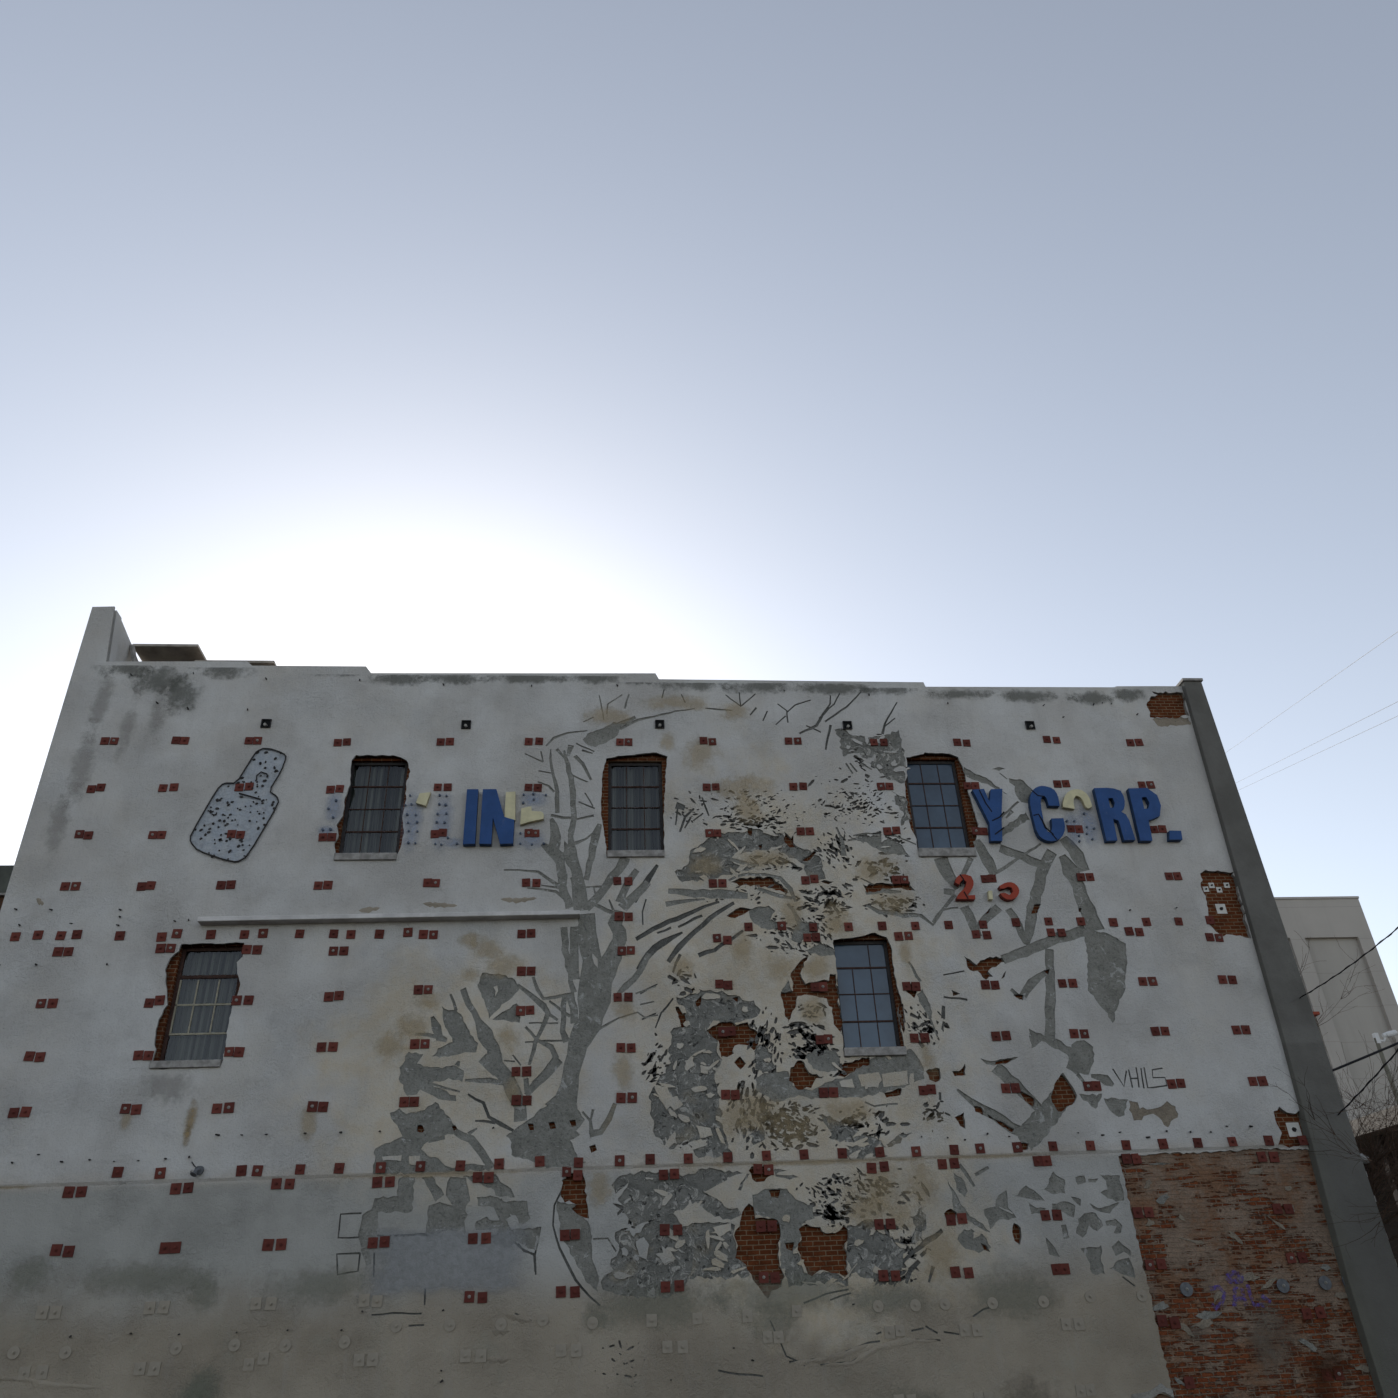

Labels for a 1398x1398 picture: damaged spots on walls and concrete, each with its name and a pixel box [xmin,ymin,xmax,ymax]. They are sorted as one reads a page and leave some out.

water stain [112,665,195,707]
flaking render [1147,692,1191,727]
flaking render [1200,871,1250,938]
flaking render [358,695,1178,1299]
flaking render [944,1108,1378,1398]
flaking render [595,1340,639,1388]